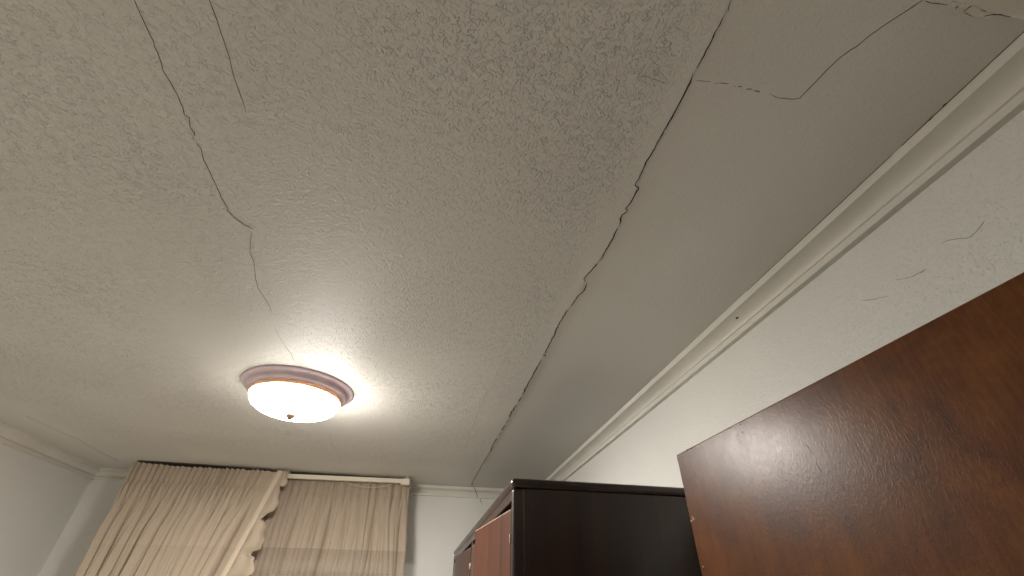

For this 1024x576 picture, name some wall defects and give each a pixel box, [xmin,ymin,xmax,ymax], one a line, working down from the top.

crack [134,0,295,362]
crack [471,0,922,501]